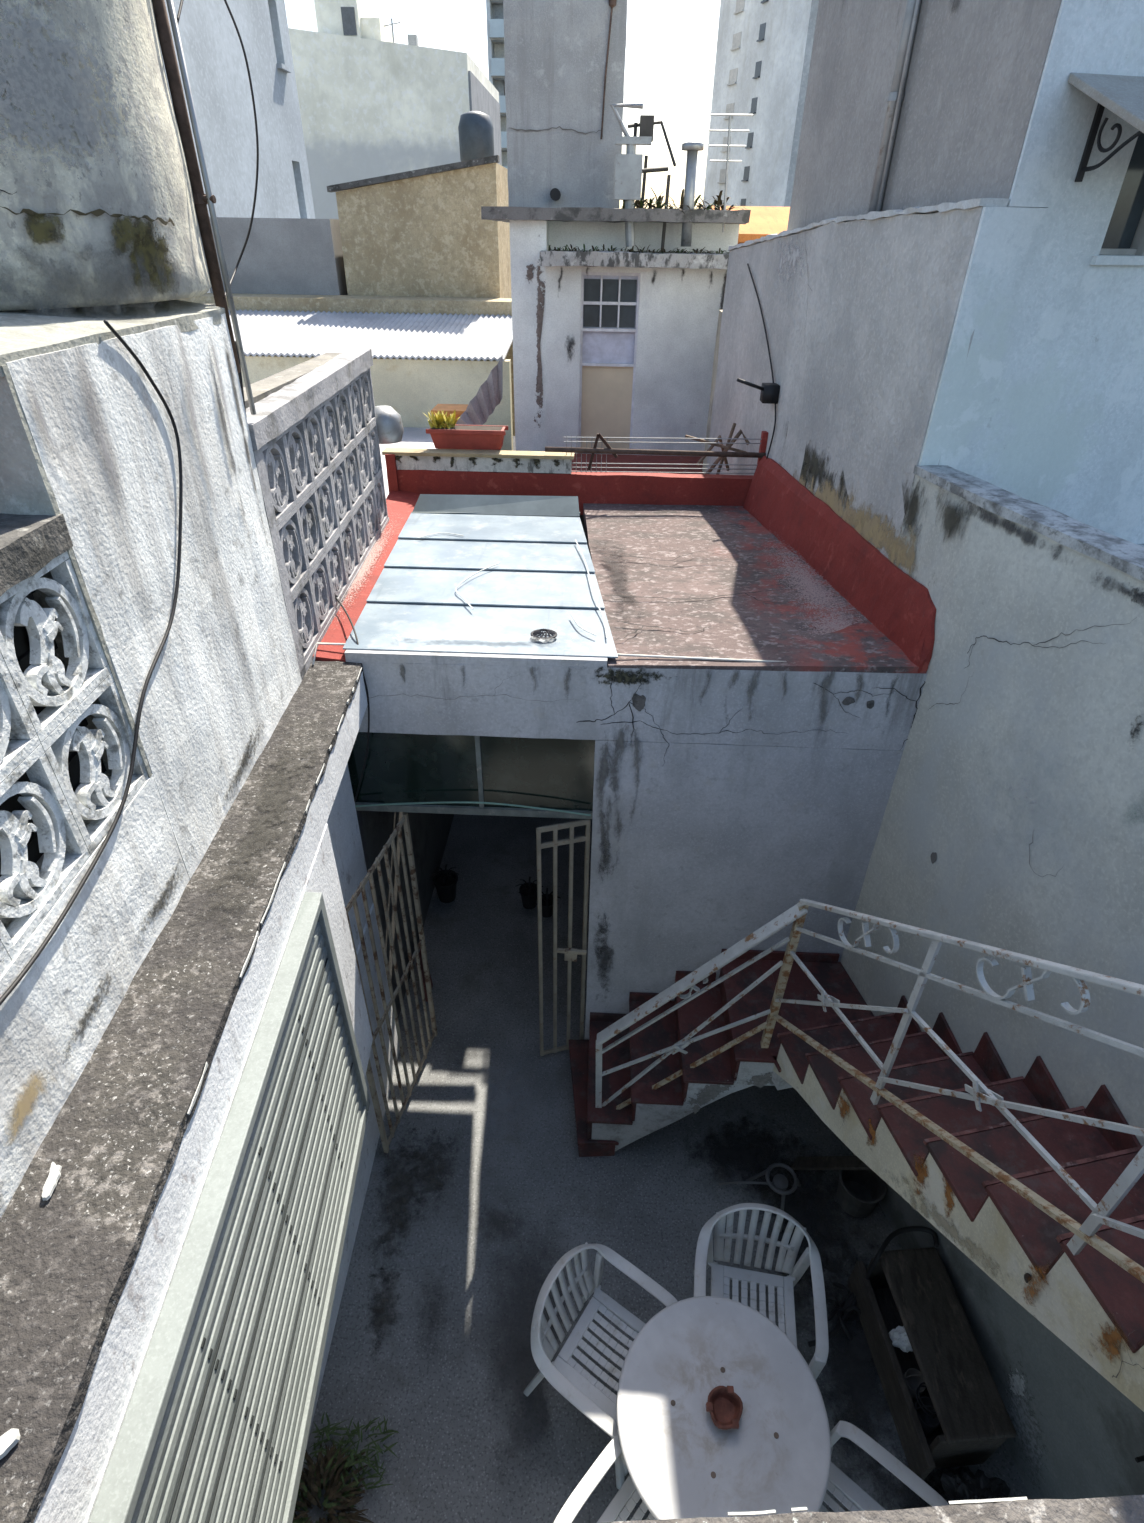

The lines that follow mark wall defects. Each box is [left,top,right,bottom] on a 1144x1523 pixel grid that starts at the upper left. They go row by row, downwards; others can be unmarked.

crack [0,189,175,226]
leakage [2,229,180,317]
leakage [780,464,915,574]
peeling [760,532,868,641]
crack [367,552,1137,764]
leakage [597,731,640,871]
leakage [596,924,614,988]
leakage [371,1130,454,1349]
corrosion [914,1155,954,1217]
corrosion [1097,1325,1133,1361]